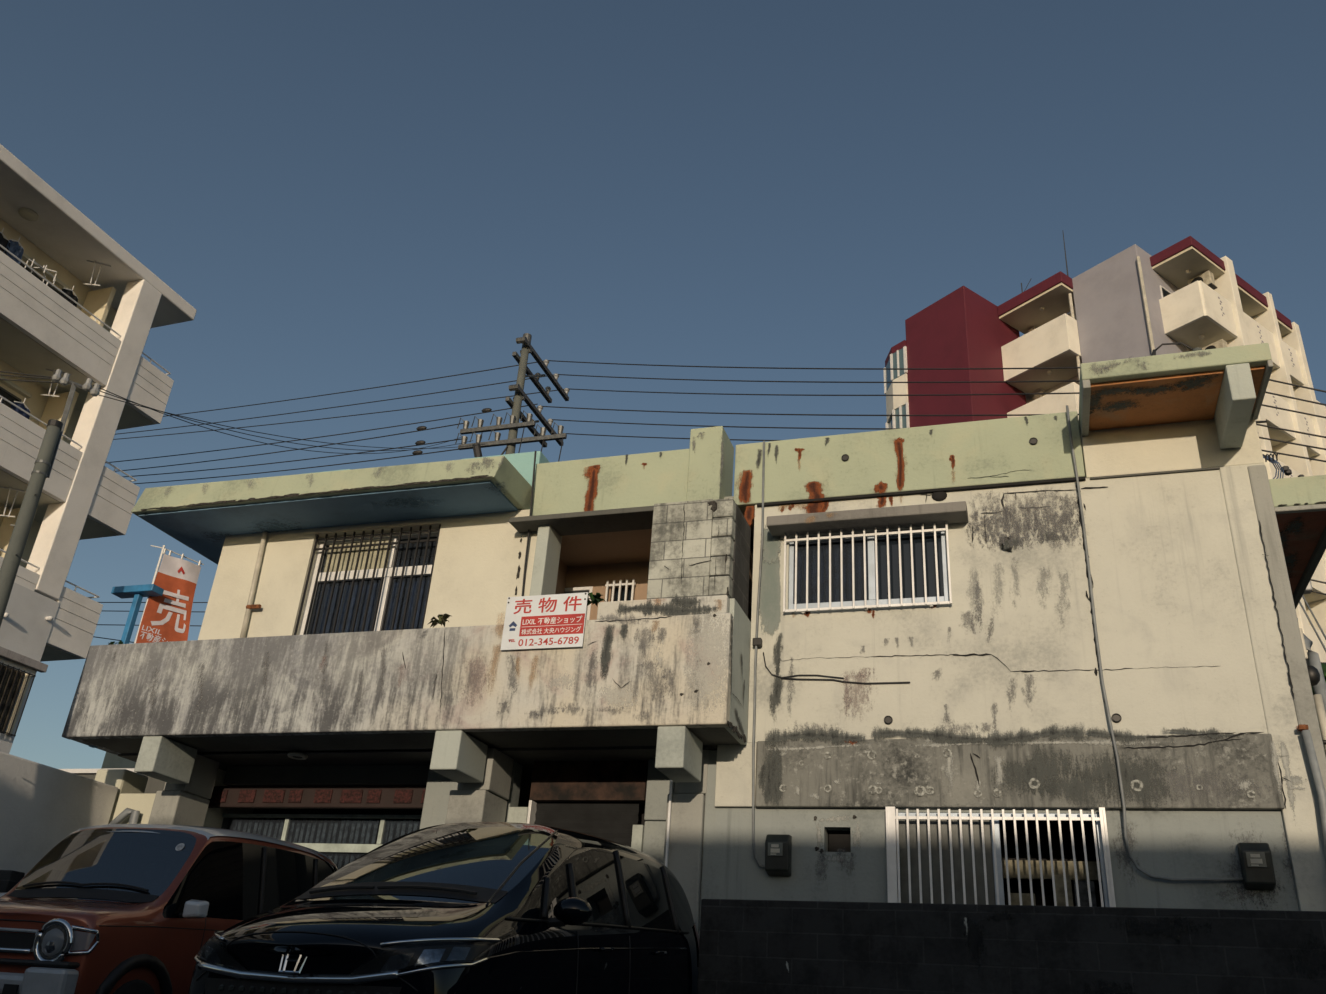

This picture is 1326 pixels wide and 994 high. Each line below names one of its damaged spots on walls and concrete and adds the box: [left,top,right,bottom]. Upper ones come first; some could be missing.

leakage [1090,374,1219,414]
corrosion [584,465,600,511]
corrosion [738,470,755,525]
corrosion [780,481,829,513]
corrosion [874,437,905,508]
leakage [969,490,1079,550]
leakage [586,594,716,718]
leakage [731,616,745,736]
leakage [759,528,793,713]
leakage [964,584,992,638]
crack [785,470,1215,703]
leakage [759,675,1238,809]